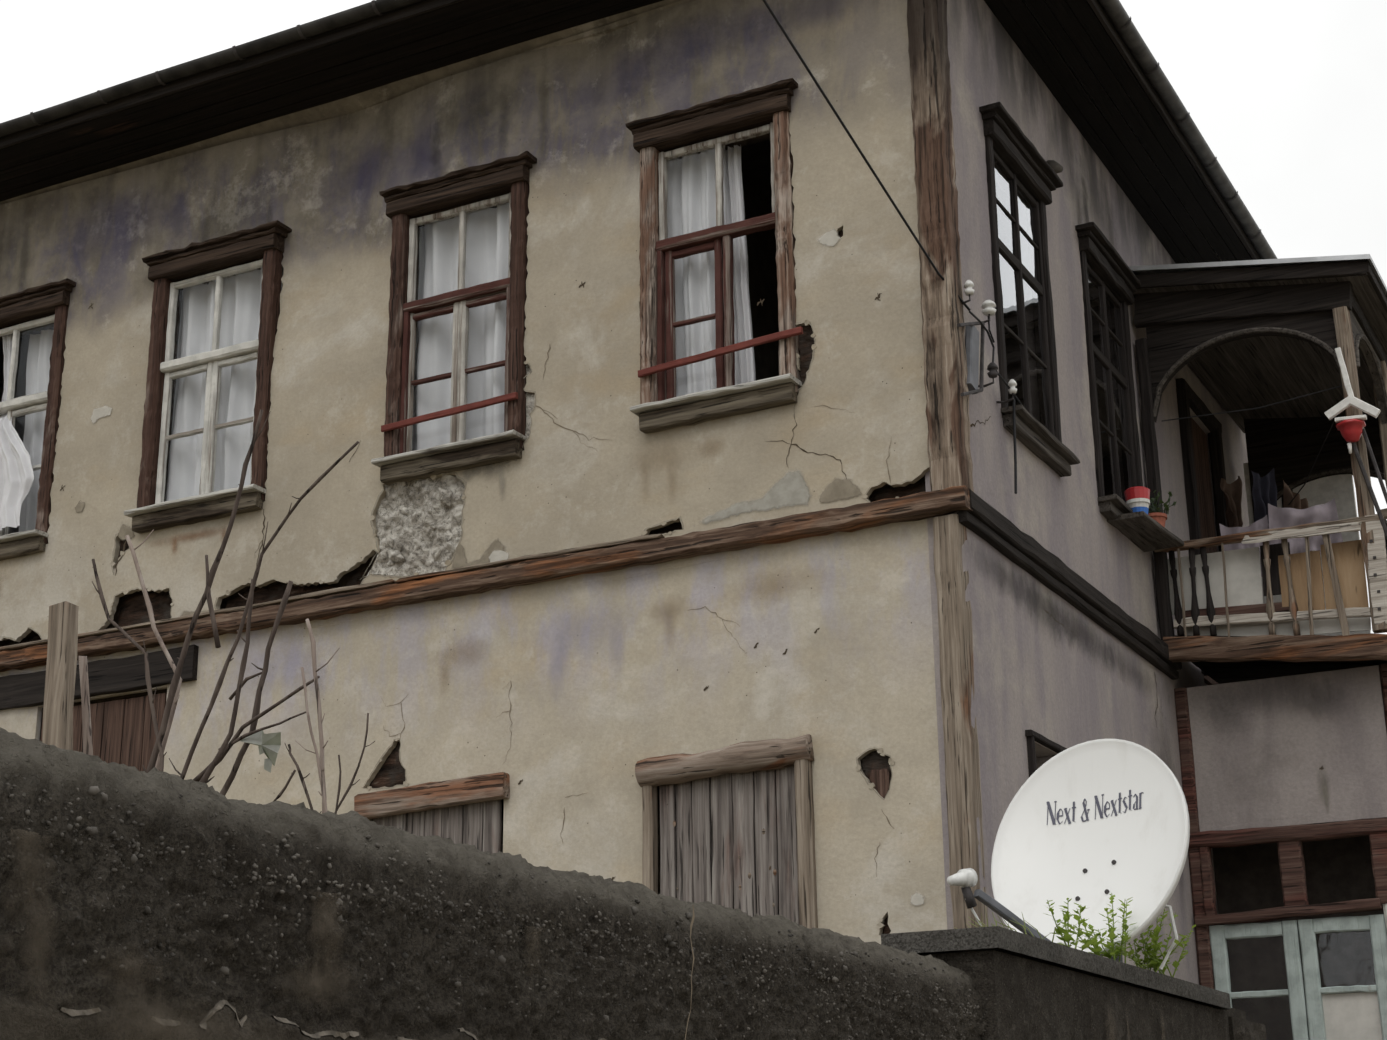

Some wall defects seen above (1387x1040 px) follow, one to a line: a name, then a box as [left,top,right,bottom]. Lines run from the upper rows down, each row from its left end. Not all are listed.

crack [536,346,608,449]
crack [766,386,851,479]
flaking render [862,471,926,503]
flaking render [97,472,508,631]
flaking render [0,627,42,647]